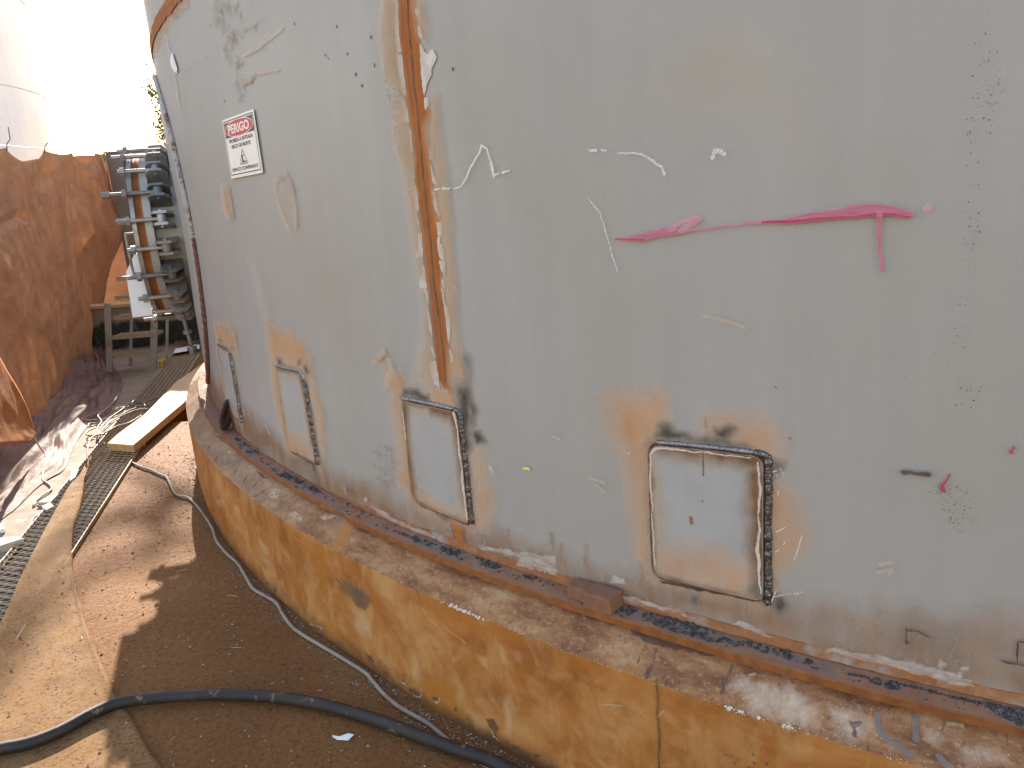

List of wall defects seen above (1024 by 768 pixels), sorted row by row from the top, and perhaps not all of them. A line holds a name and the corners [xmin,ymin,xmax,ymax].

peeling [392,0,413,153]
peeling [415,8,437,110]
rust [381,0,463,397]
peeling [412,176,440,391]
peeling [429,148,454,363]